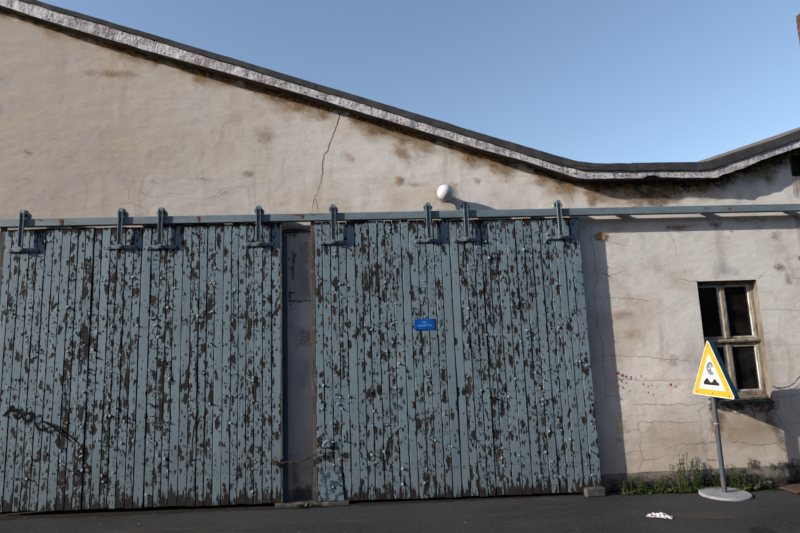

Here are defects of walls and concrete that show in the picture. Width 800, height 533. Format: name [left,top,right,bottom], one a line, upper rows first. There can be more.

crack [312,112,340,209]
damp [344,111,435,149]
damp [445,142,515,172]
damp [528,147,800,207]
peeling [45,302,133,444]
crack [580,225,710,461]
peeling [502,363,573,483]
damp [708,401,781,441]
damp [770,458,800,470]